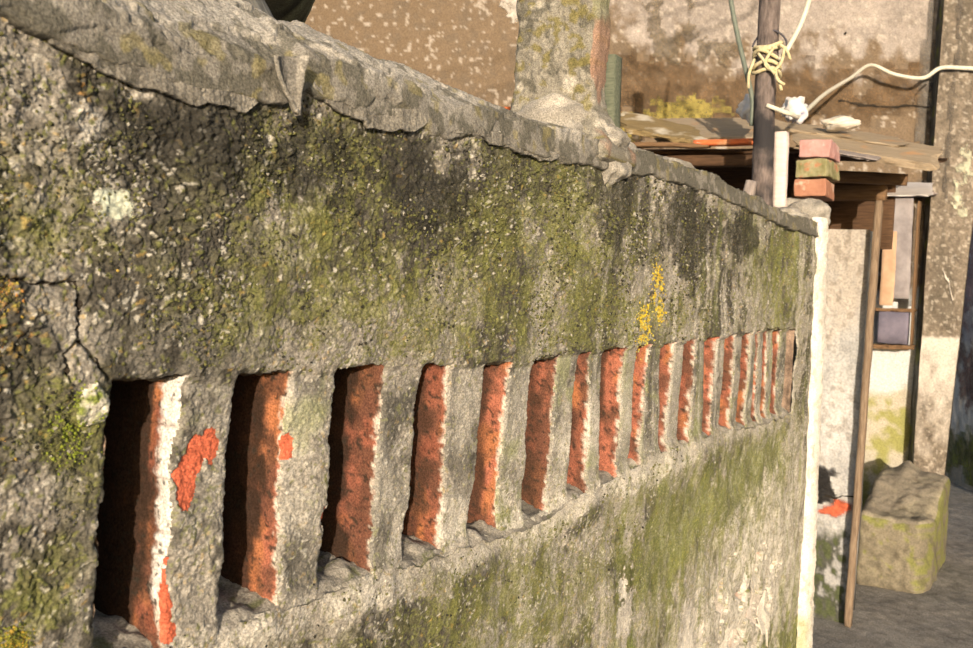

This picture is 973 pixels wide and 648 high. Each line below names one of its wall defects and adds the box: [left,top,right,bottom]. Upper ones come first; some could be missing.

water stain [645,0,738,66]
crack [0,276,107,377]